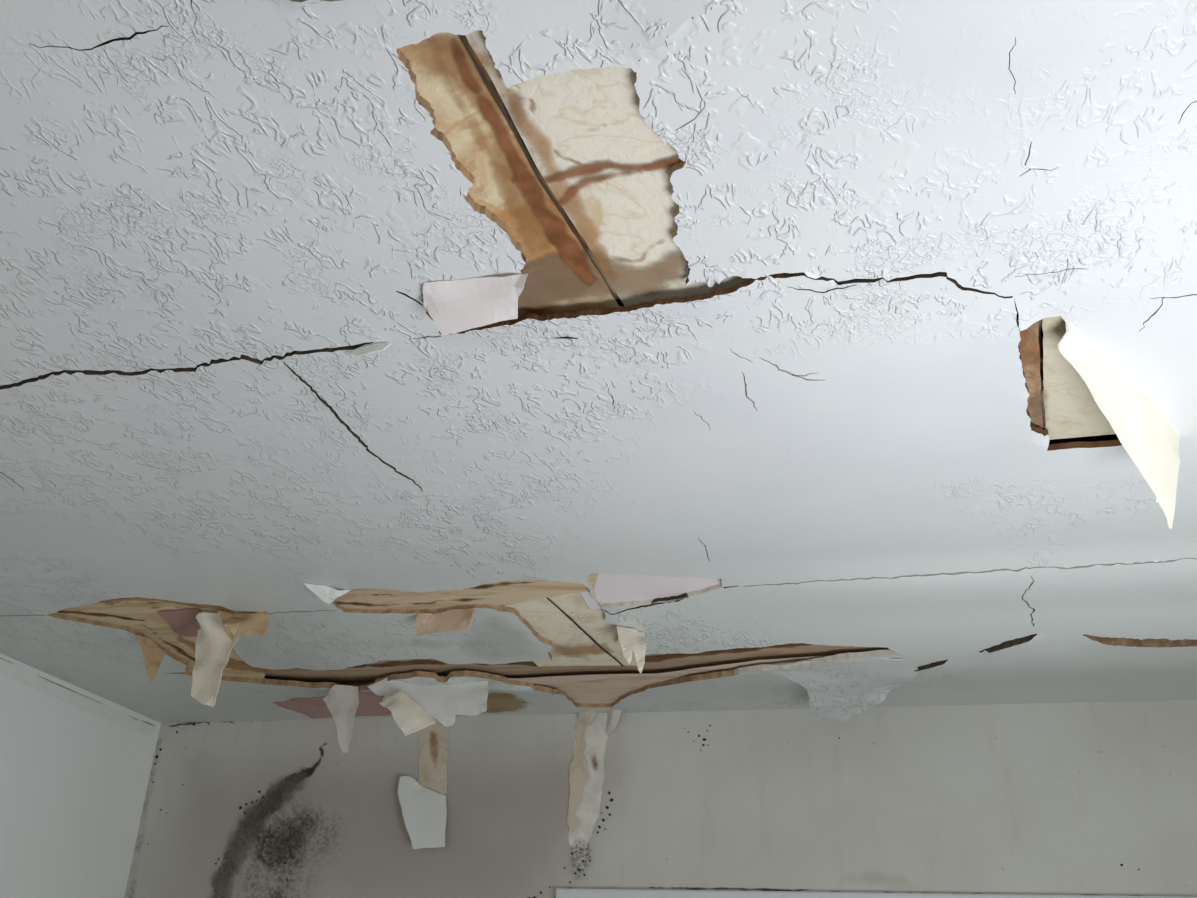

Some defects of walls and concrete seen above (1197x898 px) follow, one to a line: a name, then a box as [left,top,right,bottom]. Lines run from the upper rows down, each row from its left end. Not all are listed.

spalling [397,30,790,336]
crack [0,342,423,492]
crack [730,348,820,410]
crack [788,268,1084,298]
spalling [1015,303,1180,529]
crack [1140,294,1197,331]
spalling [47,597,269,707]
water stain [214,744,326,898]
peeling [269,676,488,849]
spalling [304,573,919,869]
crack [915,660,948,671]
crack [743,558,1197,653]